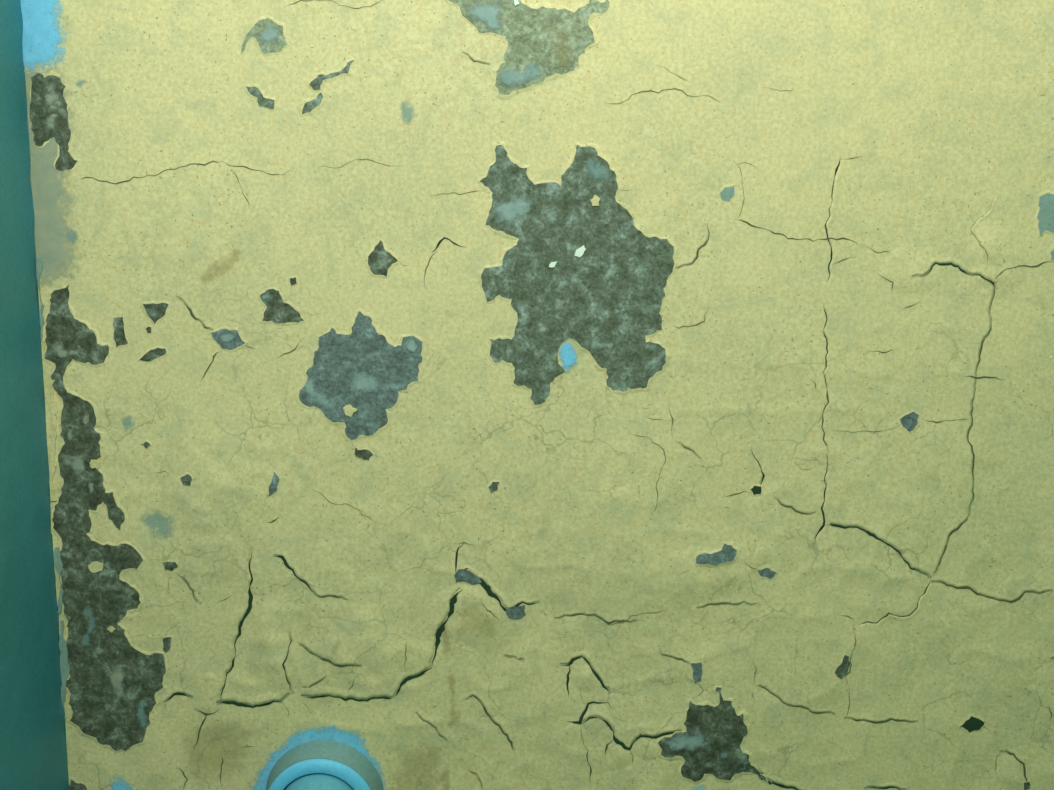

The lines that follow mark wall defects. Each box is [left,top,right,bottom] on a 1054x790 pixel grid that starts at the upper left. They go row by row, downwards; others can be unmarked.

peeling [444,0,611,100]
peeling [28,70,82,174]
crack [80,161,287,203]
peeling [476,141,679,409]
crack [676,221,710,268]
peeling [294,308,426,461]
crack [726,156,1053,723]
peeling [41,282,172,753]
crack [155,542,661,750]
crack [559,651,682,780]
spalling [656,661,769,784]
crack [754,762,824,790]